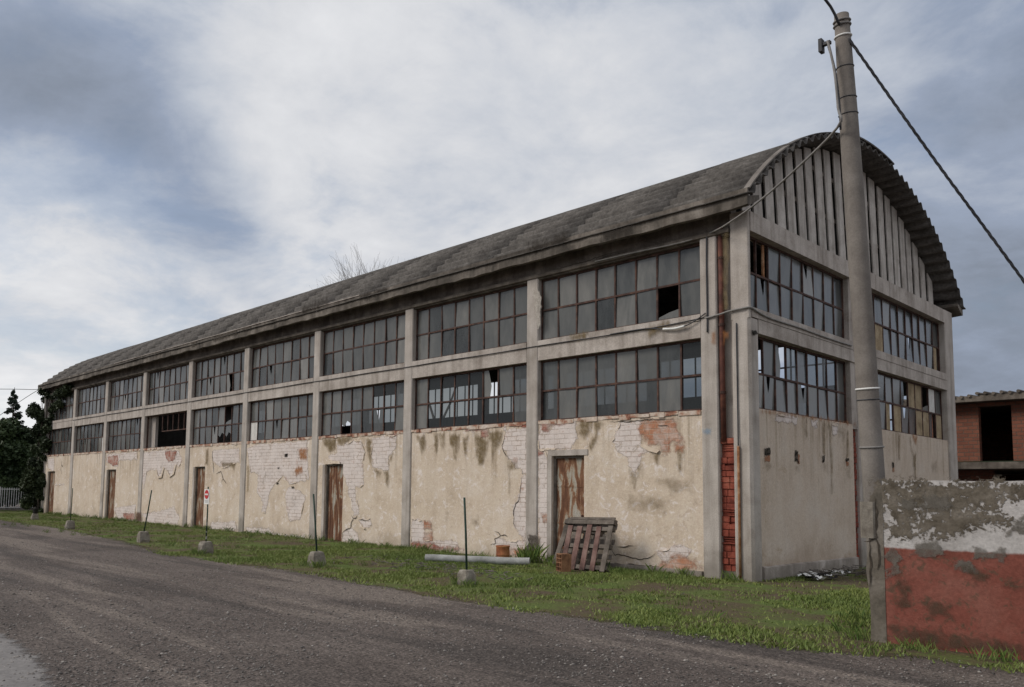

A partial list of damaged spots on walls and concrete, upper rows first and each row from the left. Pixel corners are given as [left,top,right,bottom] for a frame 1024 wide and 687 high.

peeling [106,449,182,489]
peeling [210,440,309,538]
peeling [329,433,397,543]
water stain [417,432,502,464]
peeling [494,421,578,561]
peeling [612,418,684,472]
peeling [410,517,459,551]
crack [612,545,658,567]
peeling [868,462,1024,577]